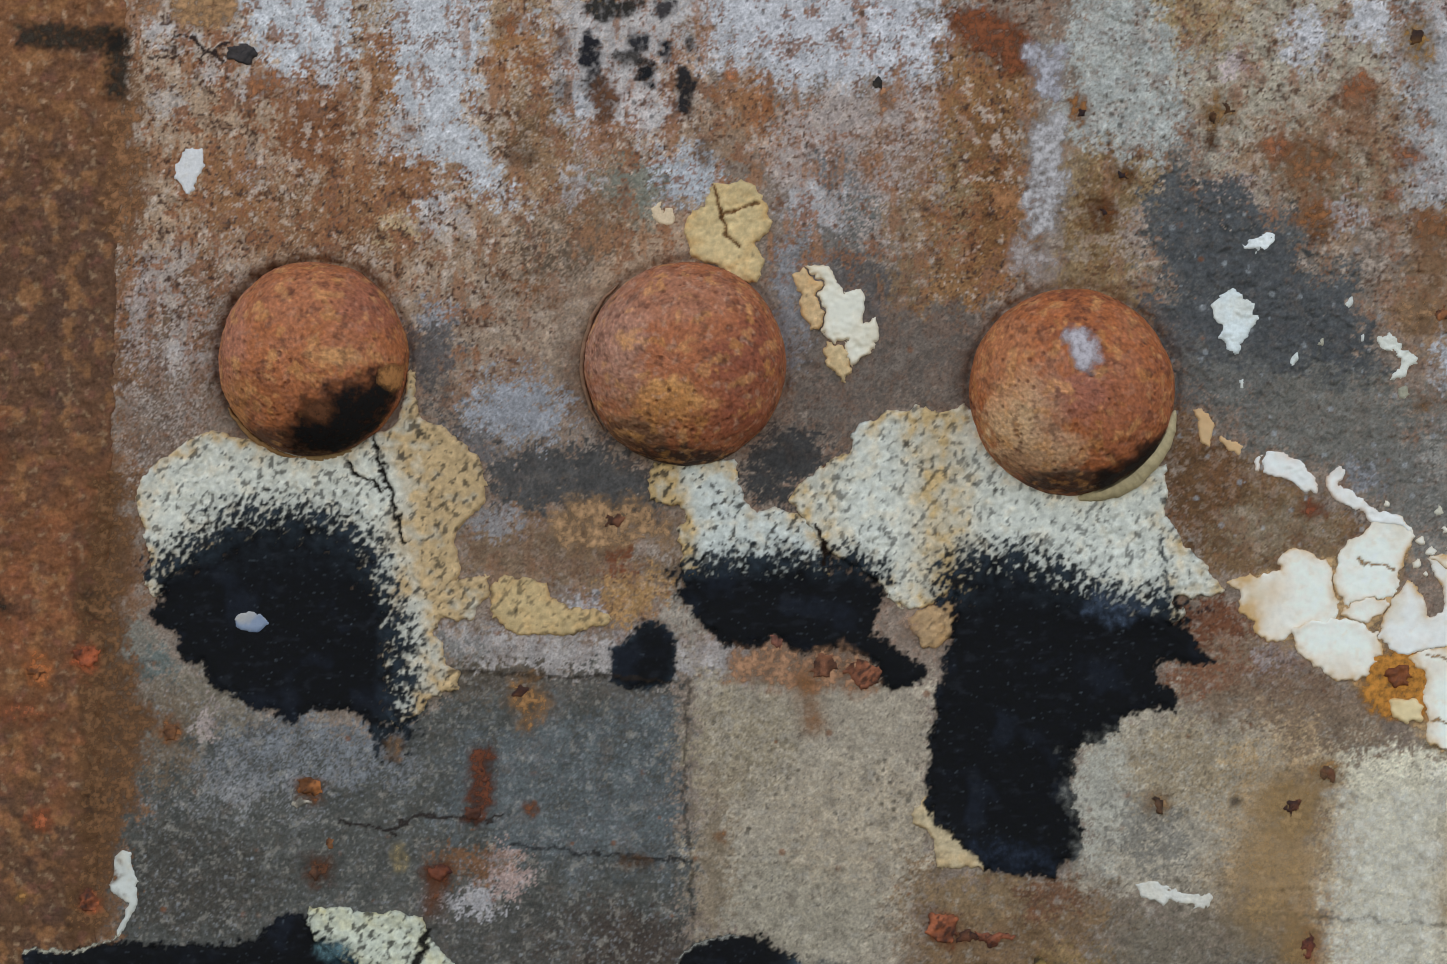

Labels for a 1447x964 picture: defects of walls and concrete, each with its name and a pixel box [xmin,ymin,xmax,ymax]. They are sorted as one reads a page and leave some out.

rust [946,6,1031,76]
rust [872,76,897,112]
rust [98,100,149,244]
peeling [651,179,773,283]
rust [579,284,619,430]
peeling [792,265,879,383]
rust [228,407,297,458]
crack [348,438,407,544]
peeling [647,403,1447,753]
rust [465,749,497,822]
rust [924,907,1016,964]